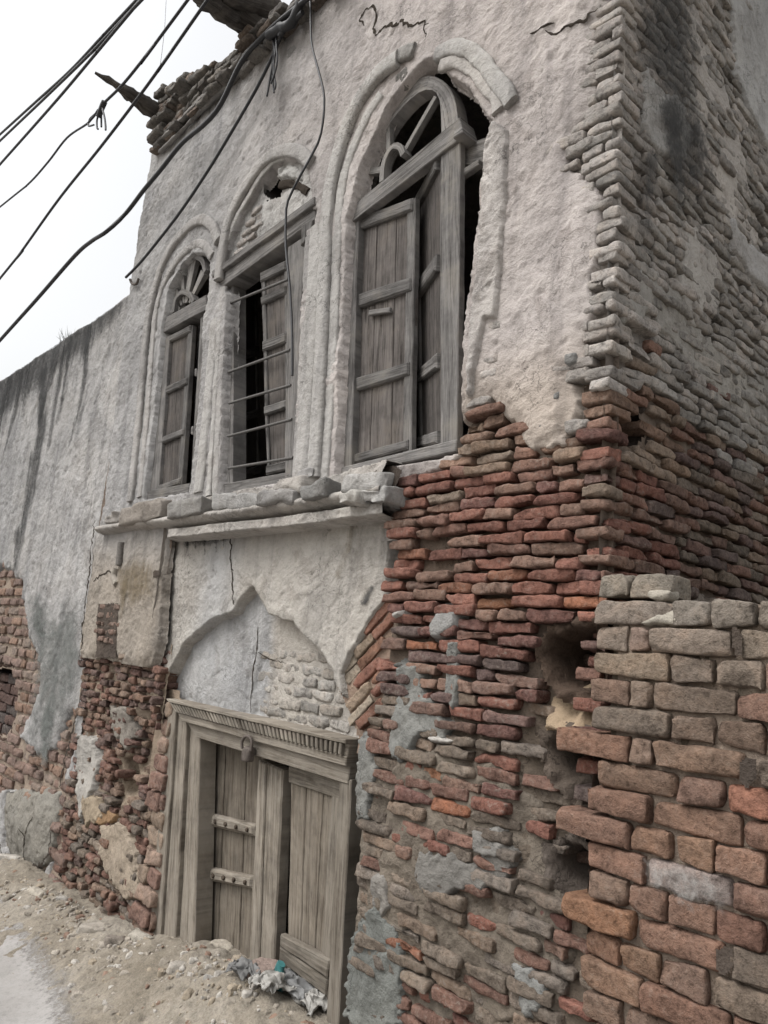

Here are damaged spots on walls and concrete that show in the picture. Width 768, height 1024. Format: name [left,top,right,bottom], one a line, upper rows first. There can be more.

crack [359,4,428,37]
crack [530,8,598,36]
spalling [546,0,768,444]
damp [0,302,121,565]
crack [227,539,235,604]
damp [28,601,80,765]
spalling [0,562,178,925]
crack [250,630,286,713]
spalling [118,396,631,1024]